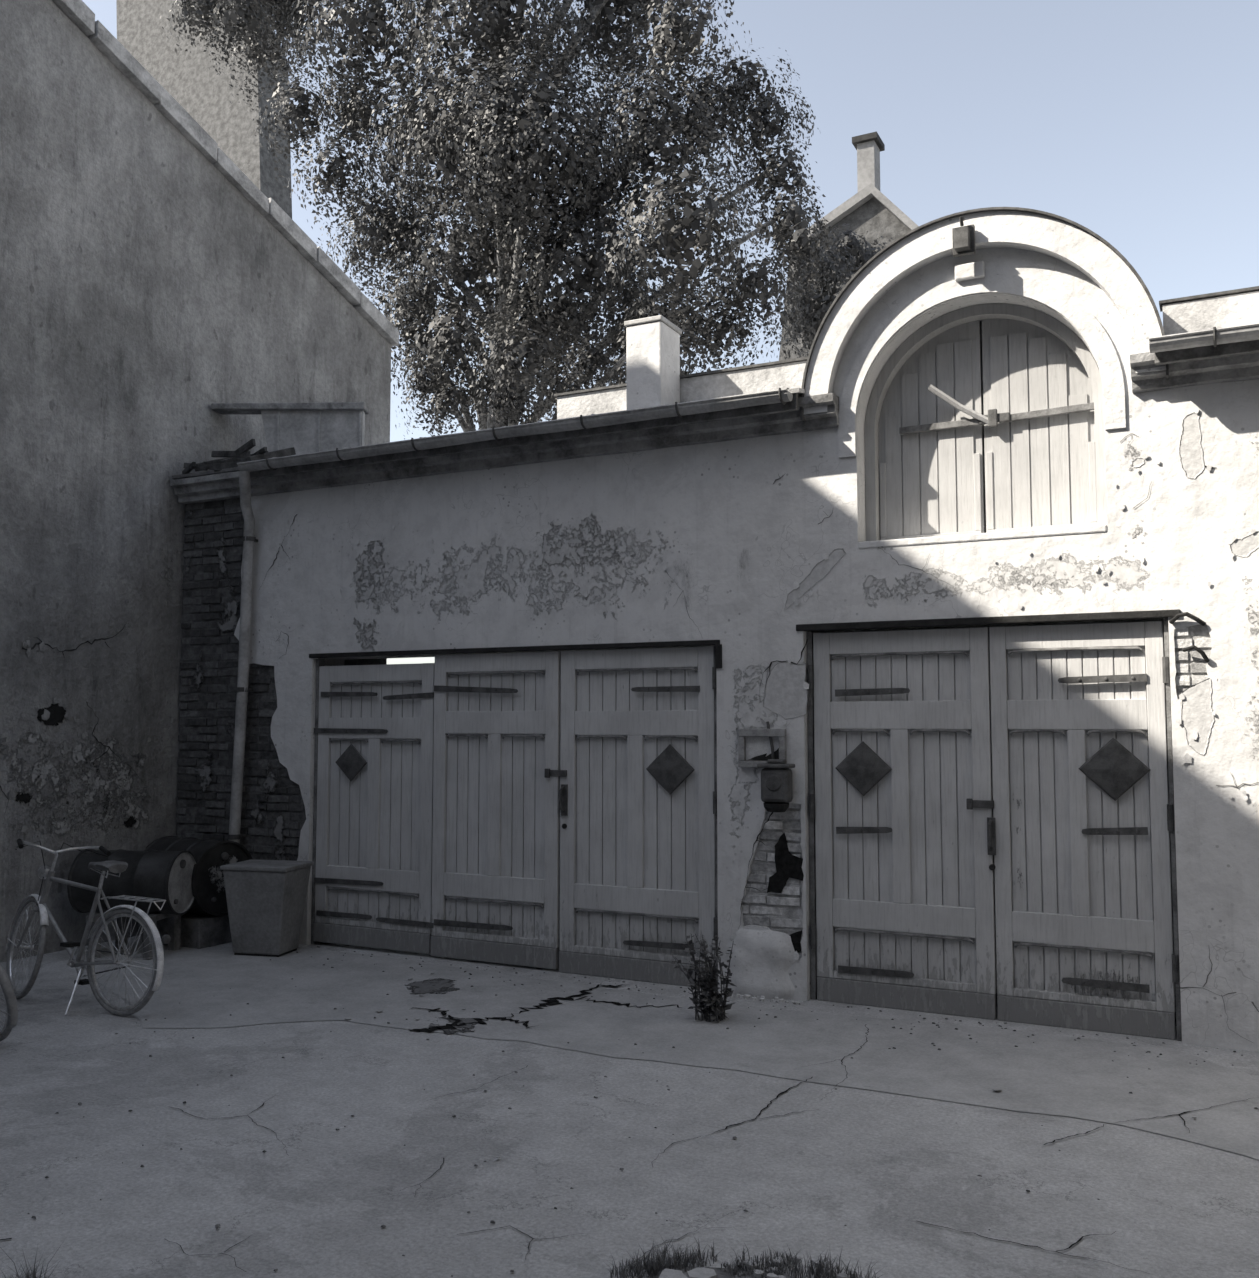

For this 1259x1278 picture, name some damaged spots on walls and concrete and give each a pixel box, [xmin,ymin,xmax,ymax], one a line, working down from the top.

spalling [1179,408,1212,479]
peeling [340,512,693,651]
peeling [863,520,1149,609]
flaking render [176,498,306,893]
peeling [728,658,809,863]
flaking render [1174,624,1218,765]
peeling [1234,571,1259,761]
flaking render [742,803,804,959]
crack [408,984,681,1032]
crack [652,1024,869,1166]
crack [1043,1098,1250,1145]
crack [918,1221,1149,1274]